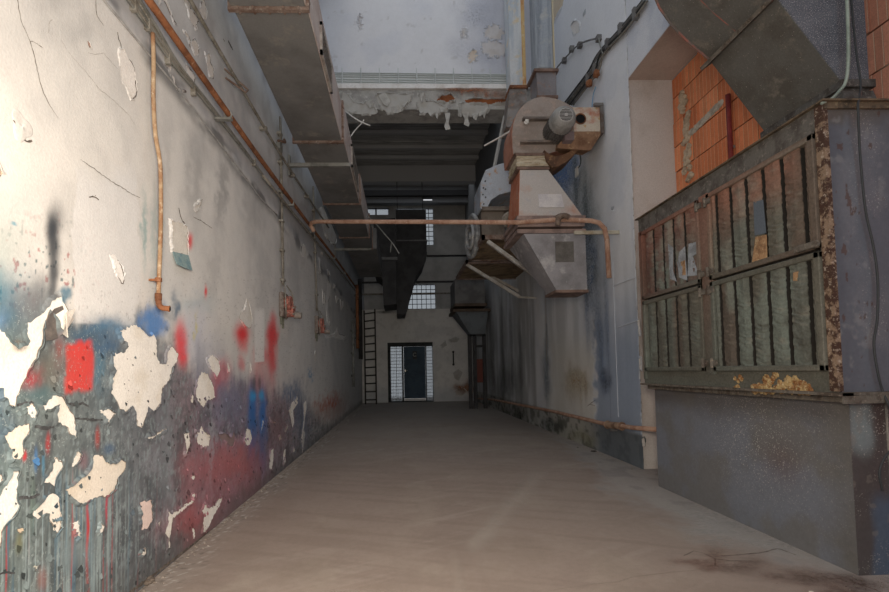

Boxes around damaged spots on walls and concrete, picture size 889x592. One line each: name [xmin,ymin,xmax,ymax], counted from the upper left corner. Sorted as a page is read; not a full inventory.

crack [17,0,134,123]
peeling [117,47,137,101]
peeling [339,91,506,130]
crack [83,161,140,200]
peeling [0,291,336,592]